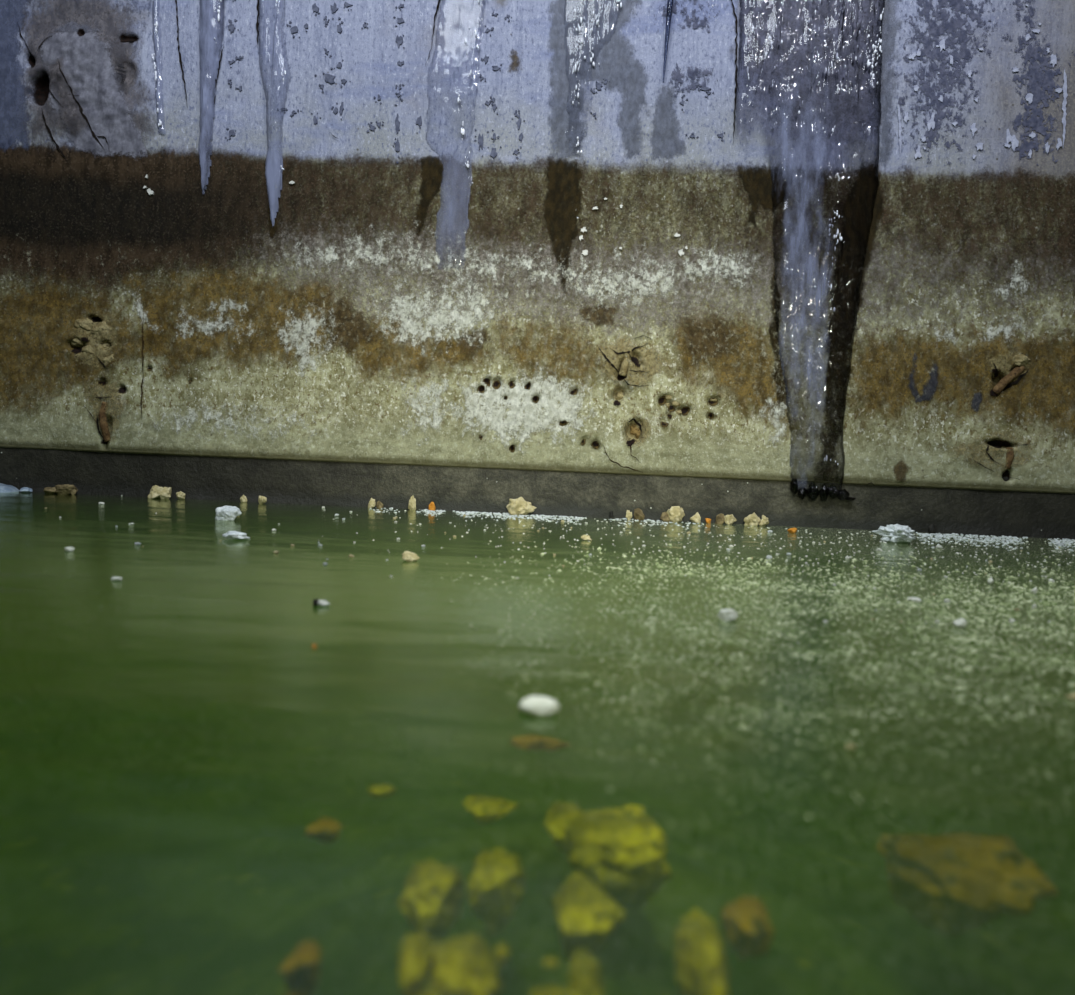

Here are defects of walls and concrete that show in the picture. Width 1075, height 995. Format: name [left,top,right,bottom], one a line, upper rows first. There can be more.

crack [17,22,111,164]
peeling [888,0,1075,169]
damp [0,0,1075,501]
spalling [71,314,126,444]
spalling [478,378,539,403]
corrosion [850,327,1075,436]
spalling [956,432,1035,480]